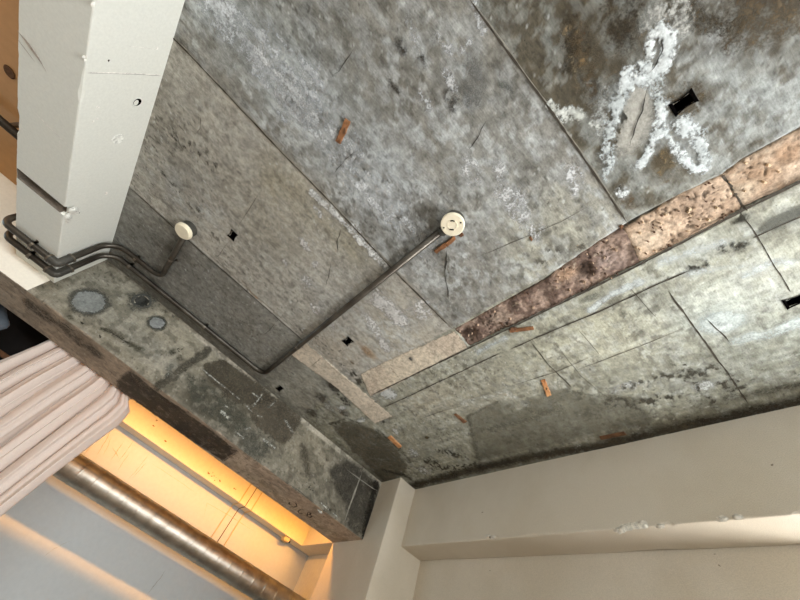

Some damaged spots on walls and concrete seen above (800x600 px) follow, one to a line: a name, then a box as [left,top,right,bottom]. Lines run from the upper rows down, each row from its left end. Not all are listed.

crack [630,40,664,143]
water stain [546,0,800,183]
efflorescence [493,161,542,240]
efflorescence [566,166,584,195]
water stain [615,188,634,209]
spalling [455,128,800,345]
water stain [22,288,112,359]
water stain [127,290,167,331]
efflorescence [691,380,718,390]
water stain [314,382,800,539]